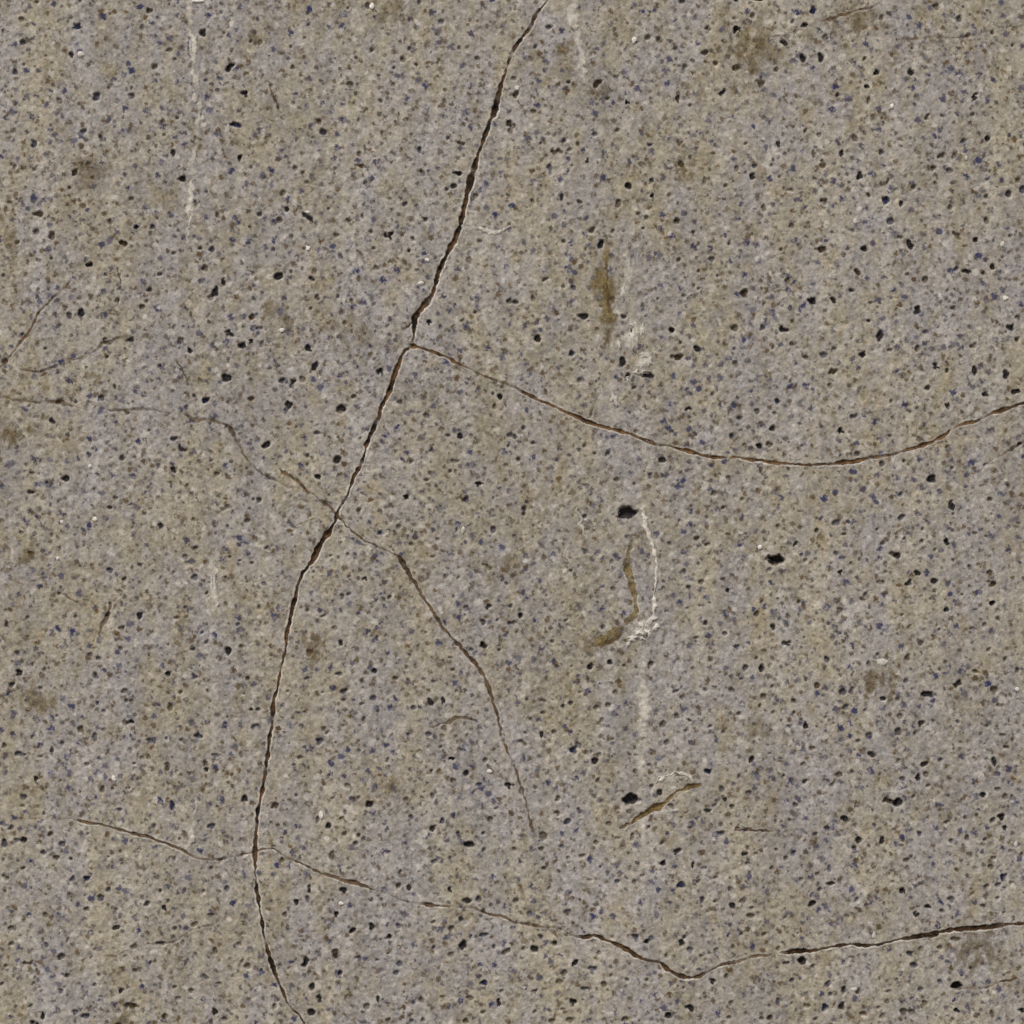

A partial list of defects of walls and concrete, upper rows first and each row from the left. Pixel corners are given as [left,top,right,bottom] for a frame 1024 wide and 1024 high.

crack [823,7,870,21]
crack [13,398,72,406]
crack [515,387,1024,467]
crack [76,0,548,1024]
crack [594,543,639,646]
damp [626,507,660,772]
crack [619,783,702,829]
crack [735,825,771,833]
crack [576,922,1024,981]